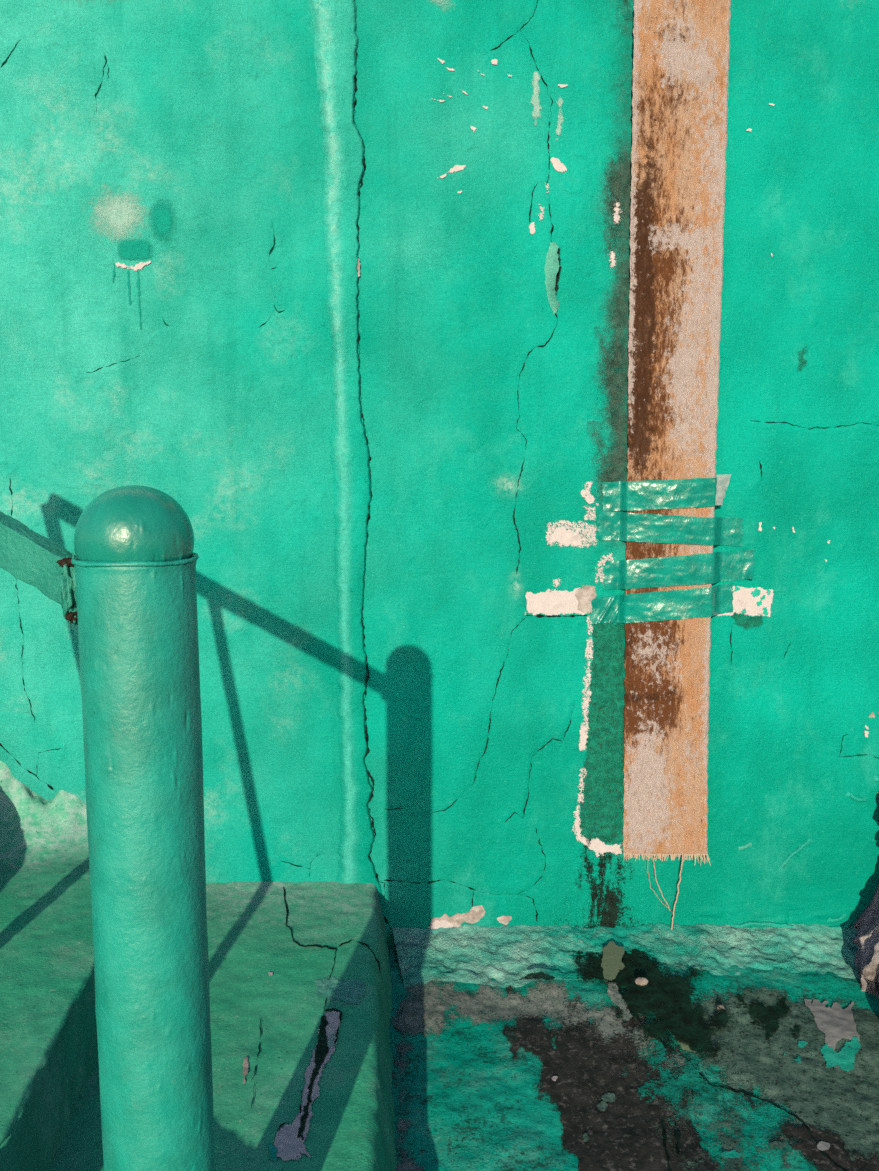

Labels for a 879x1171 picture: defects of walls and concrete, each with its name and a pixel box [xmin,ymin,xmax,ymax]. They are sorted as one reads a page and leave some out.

crack [353,51,366,243]
crack [485,0,554,242]
peeling [550,157,567,173]
peeling [544,242,561,314]
crack [513,313,558,574]
crack [750,420,873,429]
peeling [715,585,774,617]
crack [281,590,574,1008]
leakage [563,622,647,929]
peeling [428,905,512,929]
spalling [268,1008,342,1161]
leakage [392,1007,424,1171]